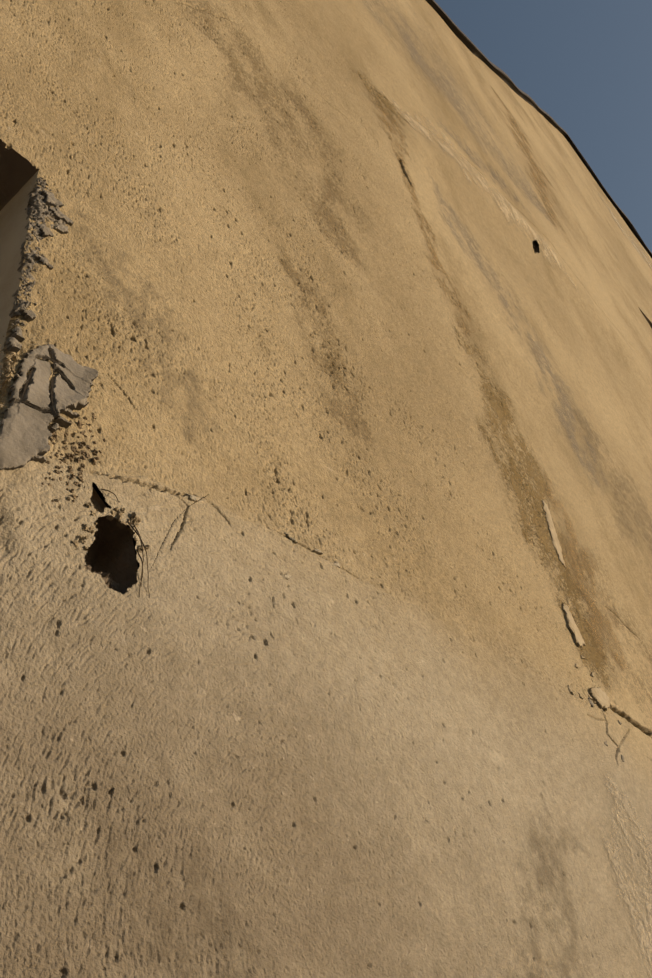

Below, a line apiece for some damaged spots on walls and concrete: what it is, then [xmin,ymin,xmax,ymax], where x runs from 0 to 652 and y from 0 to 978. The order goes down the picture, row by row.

leakage [358,72,561,268]
spalling [0,177,106,503]
spalling [84,515,138,594]
crack [109,477,207,568]
crack [284,532,340,568]
crack [588,697,625,762]